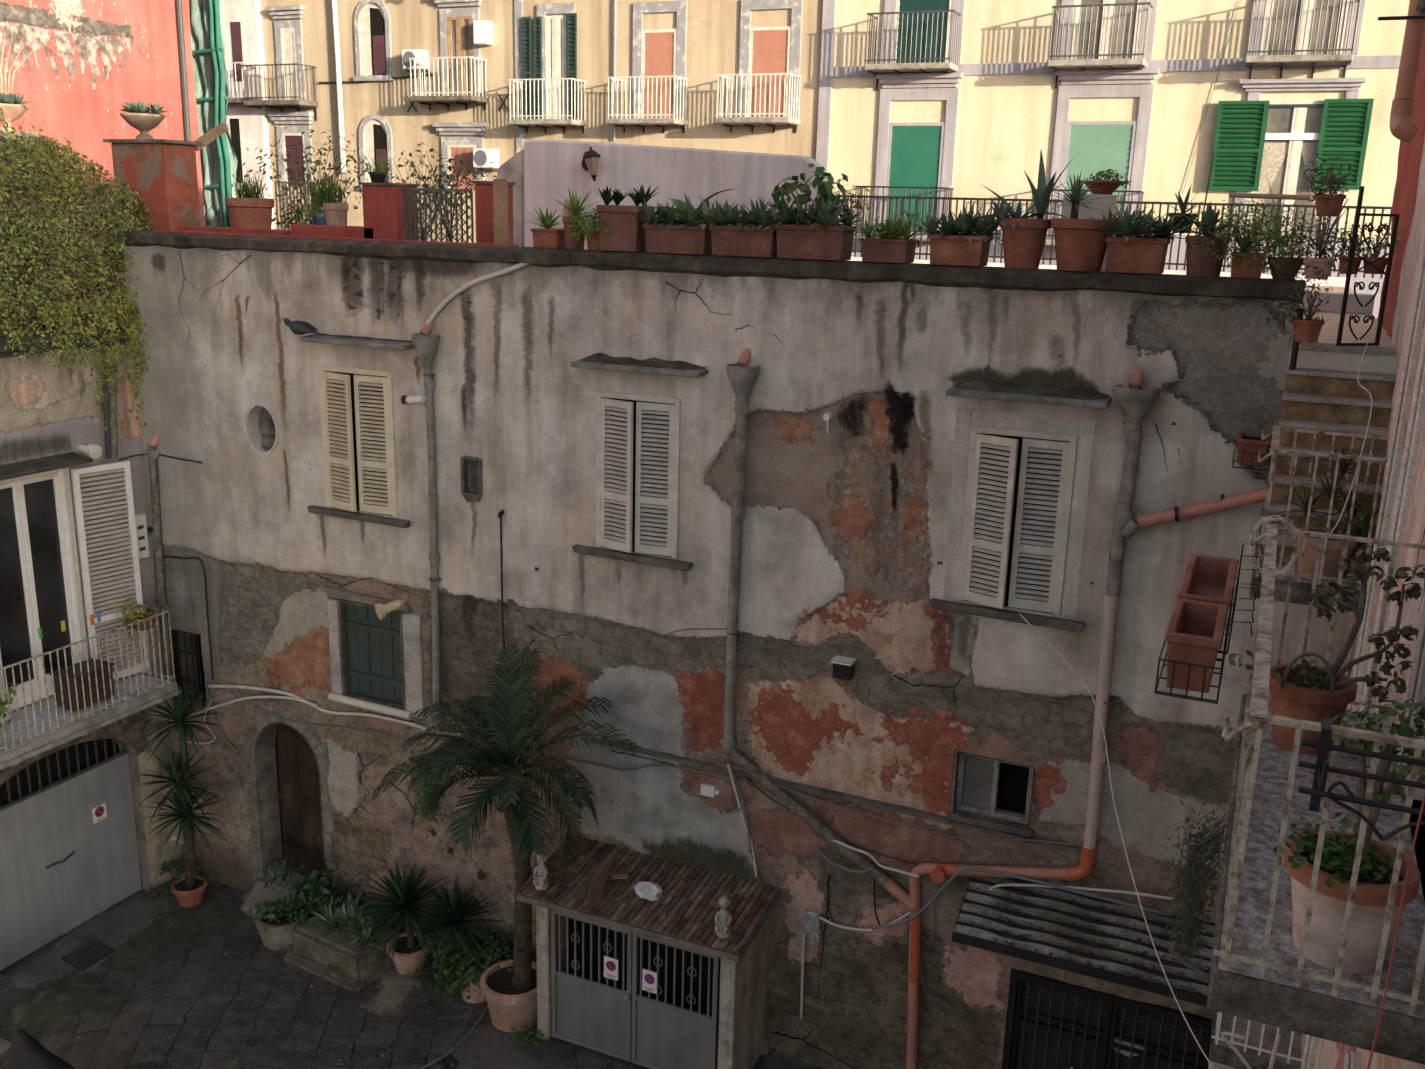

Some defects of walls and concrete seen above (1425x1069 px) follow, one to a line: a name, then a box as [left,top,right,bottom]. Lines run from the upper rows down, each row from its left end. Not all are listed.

peeling [0,0,146,92]
flaking render [0,372,142,438]
crack [178,252,252,361]
water stain [341,256,473,312]
water stain [461,295,475,418]
crack [665,277,781,342]
water stain [899,282,914,347]
flaking render [1126,298,1298,486]
flaking render [217,562,332,703]
flaking render [422,390,1124,1069]
flaking render [1158,722,1235,803]